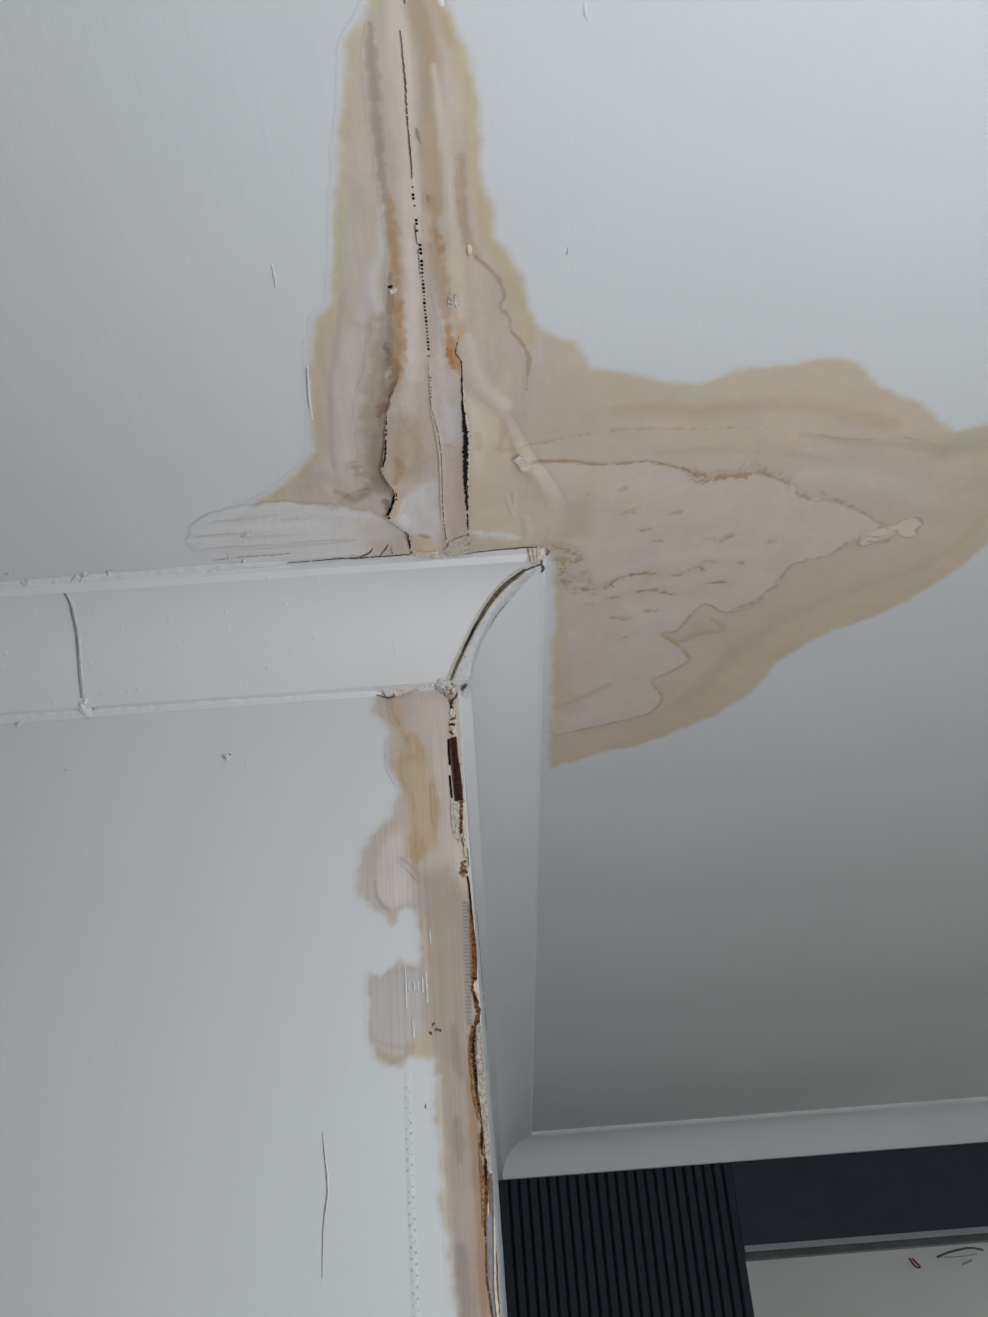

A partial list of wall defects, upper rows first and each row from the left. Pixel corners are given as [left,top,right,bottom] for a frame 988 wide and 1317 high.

peeling [306,365,314,420]
crack [214,396,412,563]
crack [400,0,413,178]
damp [246,0,988,771]
damp [352,687,501,1317]
spalling [447,704,501,1317]